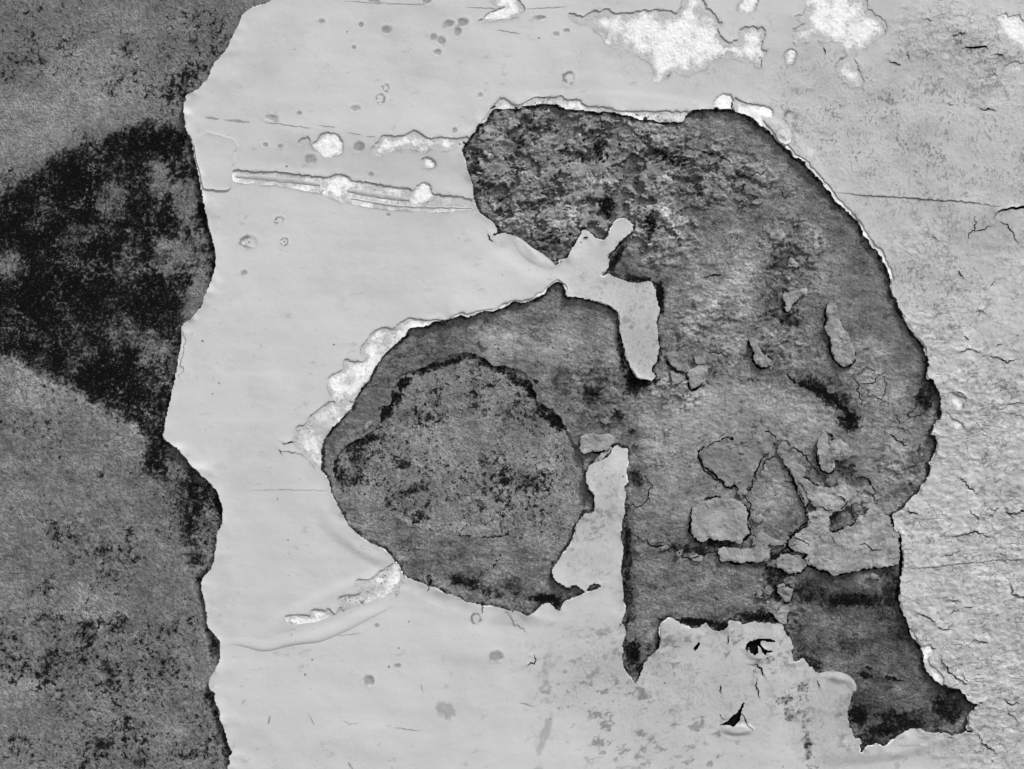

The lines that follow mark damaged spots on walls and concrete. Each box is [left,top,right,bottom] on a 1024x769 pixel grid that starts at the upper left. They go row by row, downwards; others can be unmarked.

crack [841,192,1024,242]
water stain [0,117,223,567]
peeling [0,0,271,769]
water stain [333,353,569,492]
peeling [285,93,981,751]
crack [786,366,927,446]
crack [960,336,1015,363]
crack [698,430,1024,598]
crack [918,599,972,685]